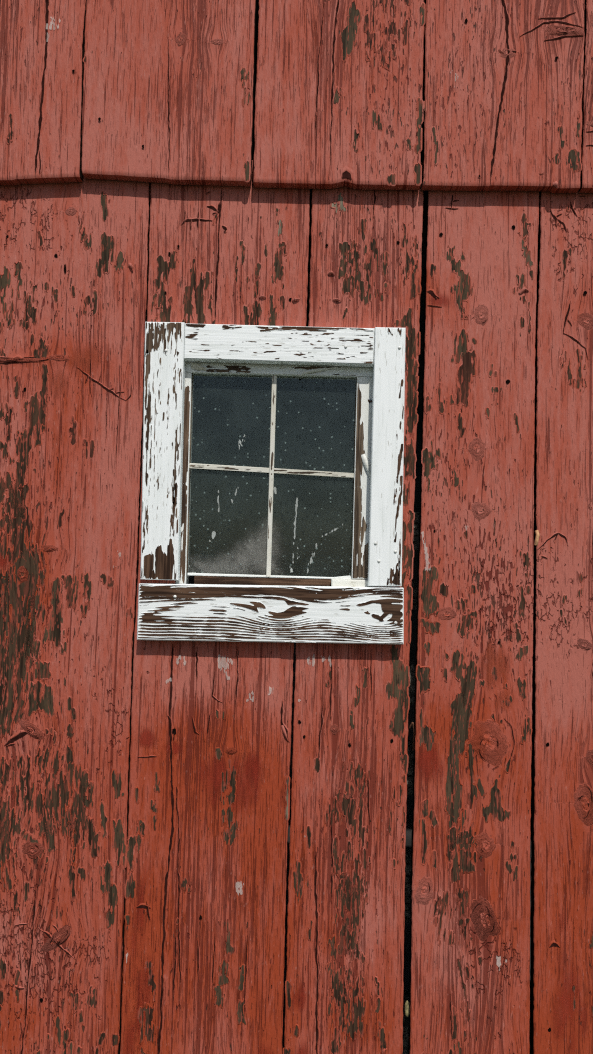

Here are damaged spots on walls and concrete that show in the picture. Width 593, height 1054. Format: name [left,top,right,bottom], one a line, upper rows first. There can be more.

crack [35,0,52,175]
crack [490,0,584,184]
peeling [512,210,535,335]
peeling [0,191,161,930]
peeling [125,207,527,1054]
peeling [514,550,532,661]